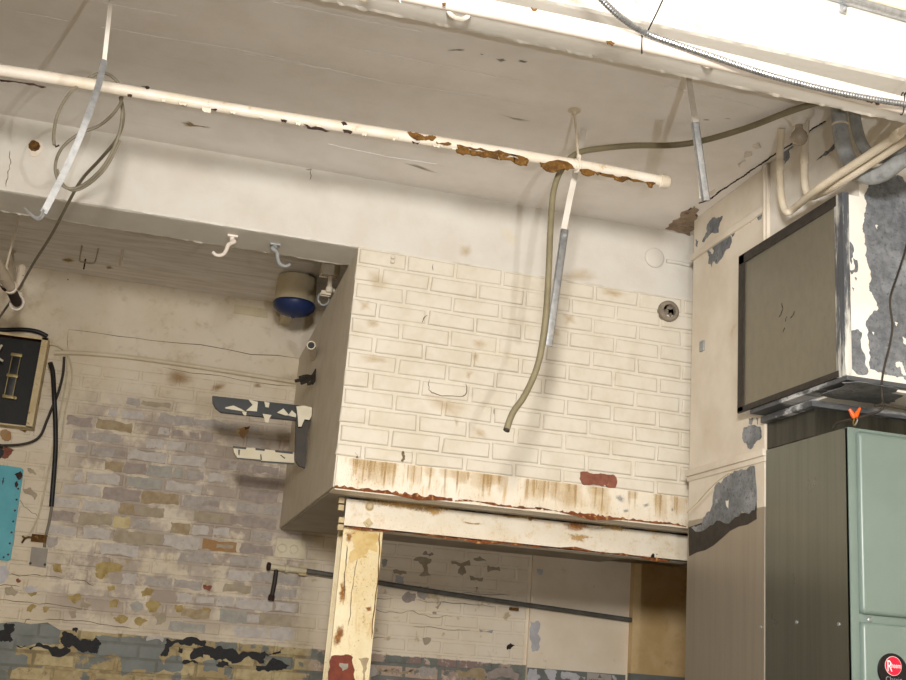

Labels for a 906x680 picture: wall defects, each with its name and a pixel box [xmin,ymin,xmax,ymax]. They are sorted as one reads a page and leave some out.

rust [408,131,528,160]
rust [540,160,575,173]
rust [596,172,655,183]
spalling [665,206,735,267]
peeling [821,175,906,404]
peeling [15,468,37,500]
peeling [46,398,312,680]
rust [335,485,686,562]
peeling [691,466,757,532]
peeling [0,566,71,671]
peeling [328,654,436,680]
peeling [456,667,585,680]